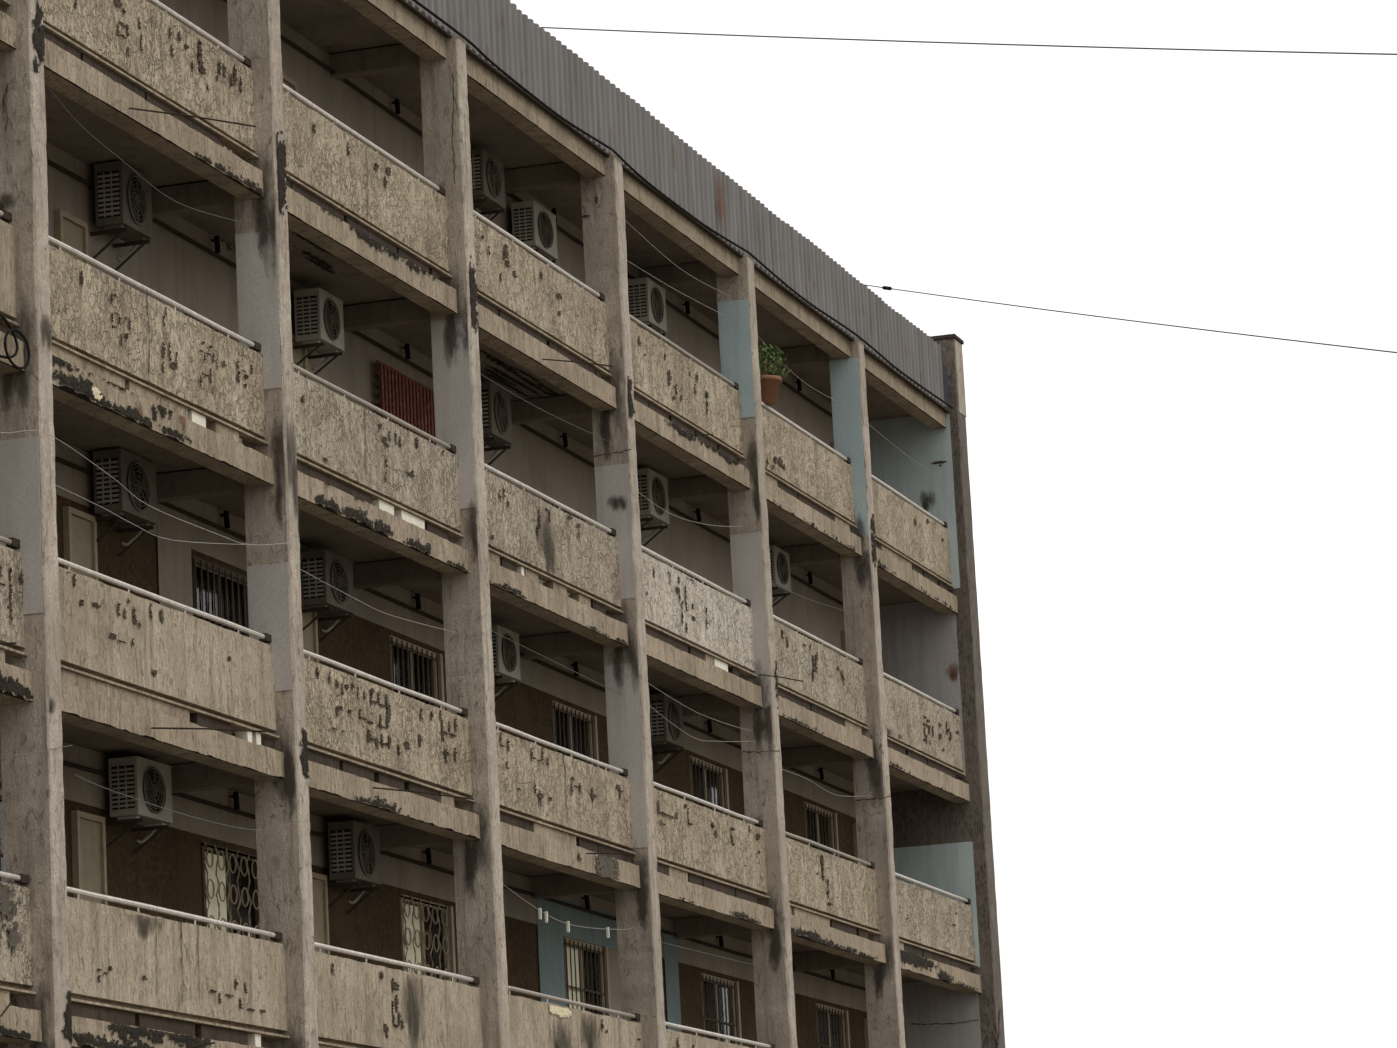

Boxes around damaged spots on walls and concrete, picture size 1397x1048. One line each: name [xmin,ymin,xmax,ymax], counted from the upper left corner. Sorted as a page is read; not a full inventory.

peeling [114,0,143,58]
peeling [169,28,243,93]
leakage [256,160,276,248]
spalling [52,355,192,444]
peeling [162,307,178,374]
peeling [199,341,253,394]
spalling [315,483,432,554]
peeling [647,567,708,633]
peeling [316,666,458,763]
spalling [300,727,309,778]
spalling [62,990,211,1048]
peeling [380,971,405,1039]